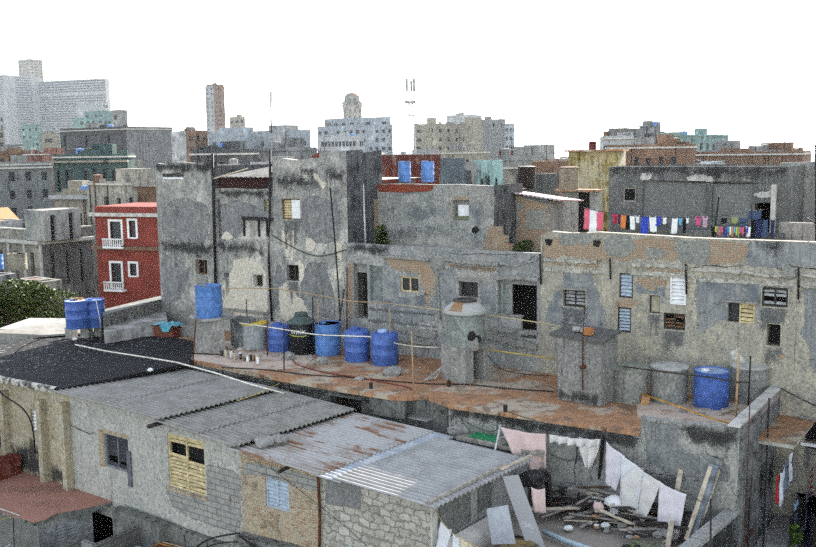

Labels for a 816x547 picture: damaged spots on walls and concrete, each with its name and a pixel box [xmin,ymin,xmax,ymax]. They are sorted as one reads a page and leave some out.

leakage [278,169,317,187]
leakage [161,190,272,258]
peeling [223,171,353,321]
leakage [283,220,299,249]
peeling [384,258,497,326]
spalling [543,232,816,334]
peeling [729,348,744,362]
peeling [800,288,816,374]
peeling [642,420,738,510]